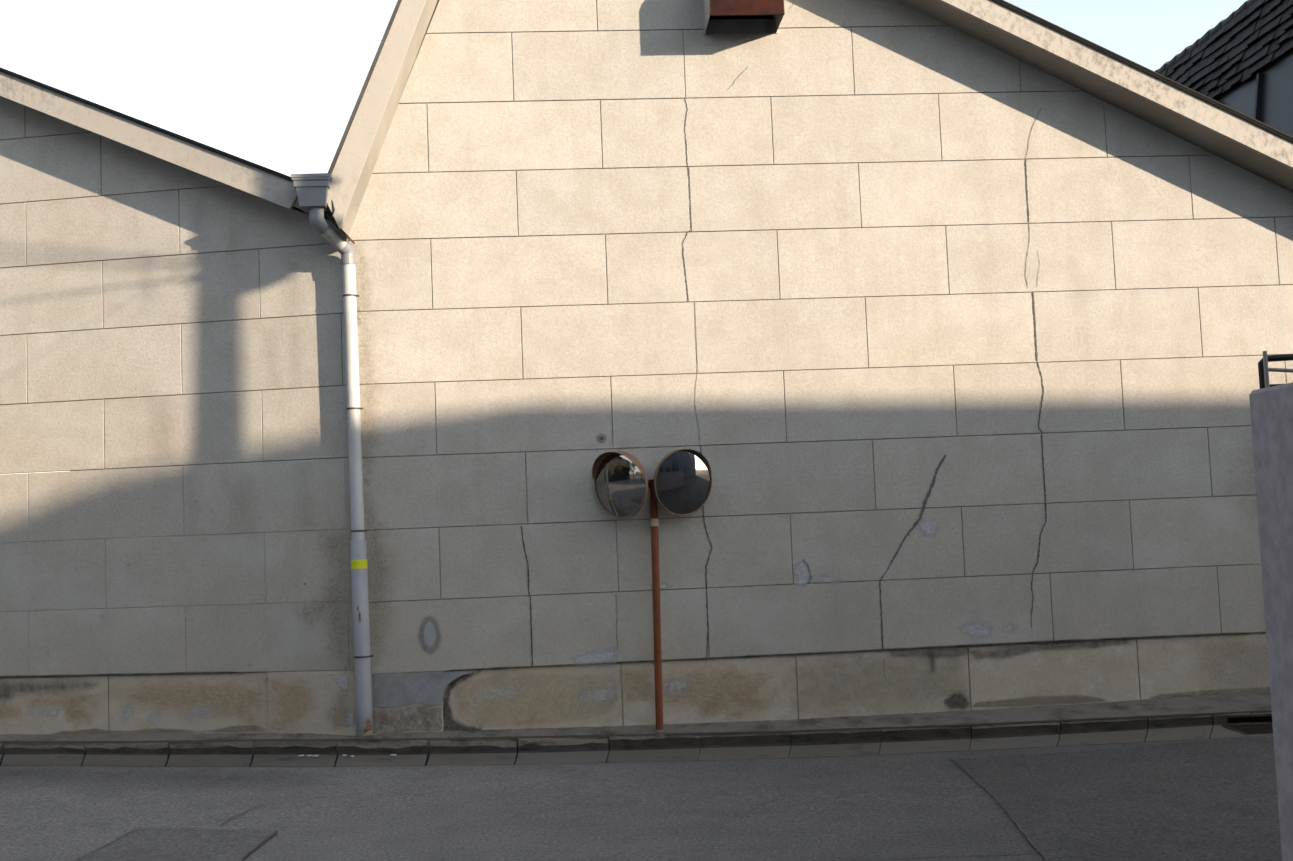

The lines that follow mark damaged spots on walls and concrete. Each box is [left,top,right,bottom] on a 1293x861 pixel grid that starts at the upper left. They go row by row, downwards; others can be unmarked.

crack [682,99,702,454]
crack [1025,108,1047,627]
damp [0,672,243,697]
crack [702,506,713,659]
damp [443,632,1270,731]
crack [879,454,947,681]